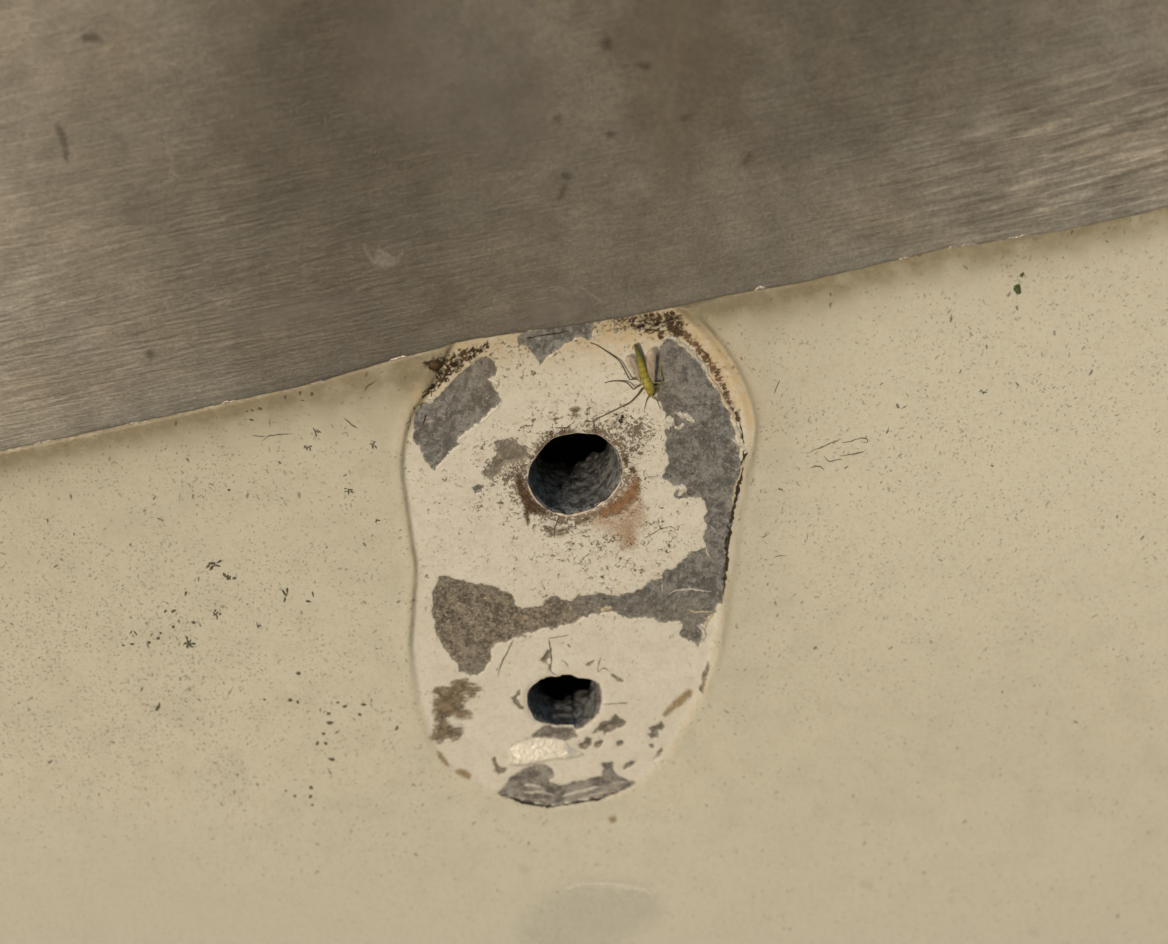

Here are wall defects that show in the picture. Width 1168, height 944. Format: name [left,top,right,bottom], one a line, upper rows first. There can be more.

peeling [517,322,594,366]
peeling [413,356,502,470]
peeling [431,335,747,675]
corrosion [601,456,640,517]
peeling [699,661,710,693]
peeling [532,714,626,750]
peeling [649,722,665,757]
peeling [491,757,636,809]